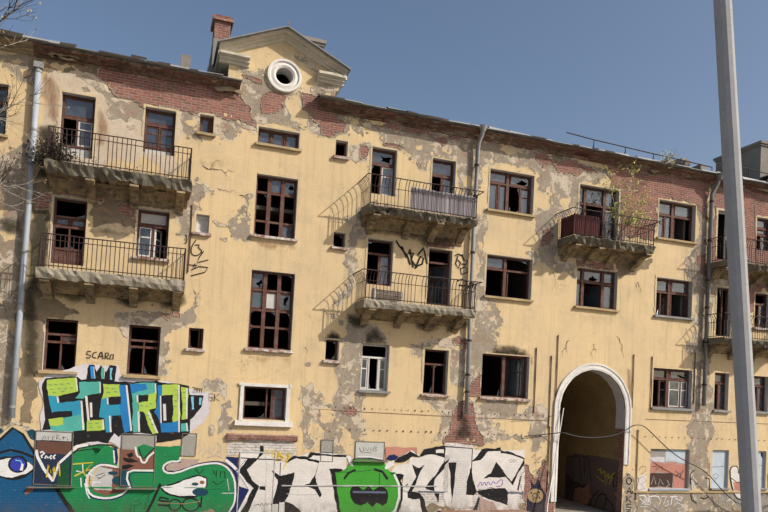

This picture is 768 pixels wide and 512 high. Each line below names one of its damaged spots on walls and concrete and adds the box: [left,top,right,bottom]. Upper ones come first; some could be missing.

flaking render [0,142,36,436]
flaking render [0,50,39,91]
damp [26,210,49,375]
mould [37,127,56,178]
flaking render [112,289,202,377]
flaking render [170,177,215,241]
flaking render [212,192,255,243]
flaking render [38,60,477,196]
flaking render [297,200,389,456]
flaking render [406,209,555,512]
flaking render [478,141,741,512]
flaking render [743,188,768,265]